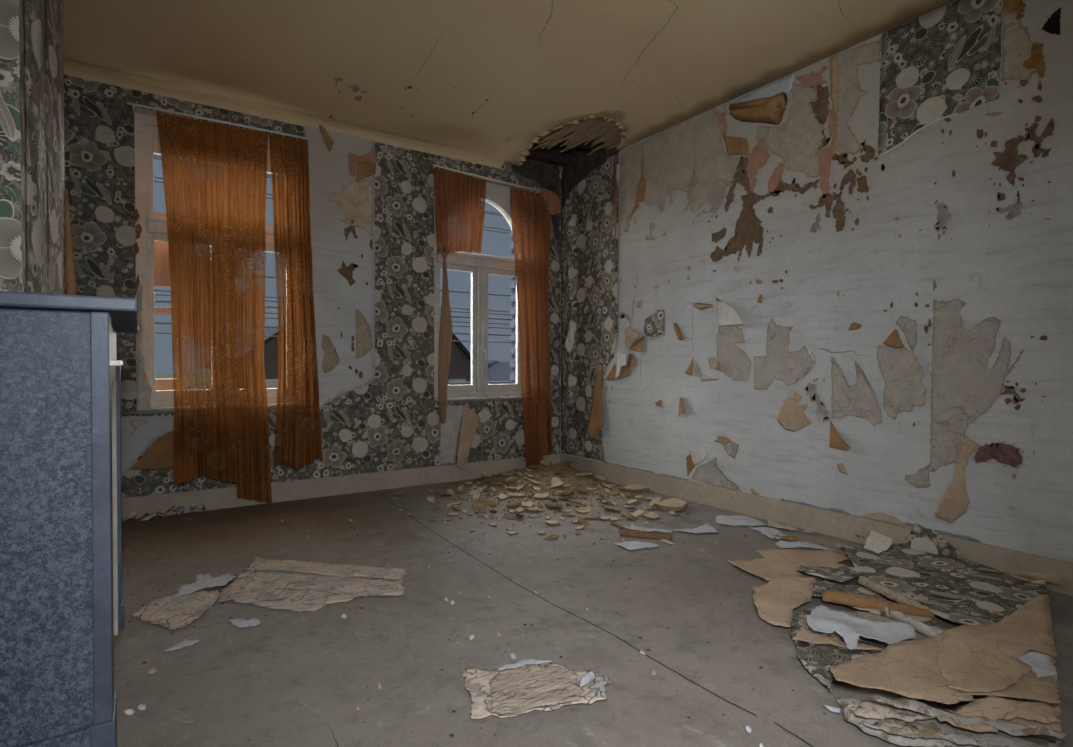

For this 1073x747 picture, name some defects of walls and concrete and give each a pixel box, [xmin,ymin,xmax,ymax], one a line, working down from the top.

spalling [1041,7,1061,35]
flaking render [304,115,376,413]
peeling [587,279,645,439]
peeling [603,454,694,481]
peeling [693,296,743,326]
peeling [690,66,885,268]
peeling [777,378,851,475]
peeling [781,435,982,543]
peeling [883,329,905,349]
peeling [898,200,952,240]
peeling [976,116,1054,227]
peeling [997,381,1046,410]